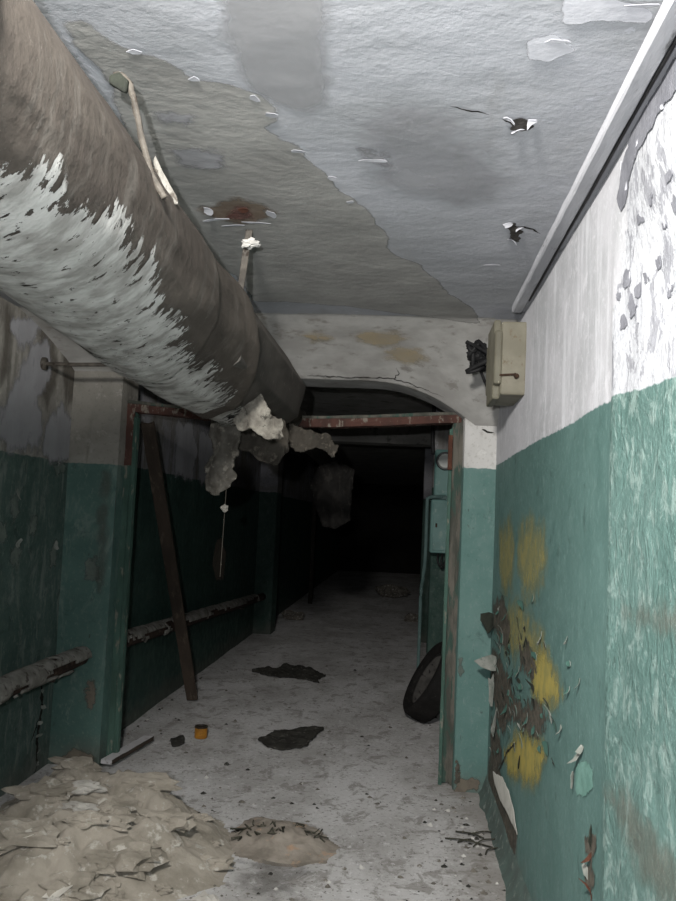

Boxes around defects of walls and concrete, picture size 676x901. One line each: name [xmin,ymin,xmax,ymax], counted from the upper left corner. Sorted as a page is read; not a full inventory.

peeling [562,0,660,24]
peeling [527,35,574,62]
spalling [503,117,538,134]
peeling [617,57,676,211]
peeling [65,21,479,323]
corrosion [201,198,276,227]
spalling [503,223,538,244]
peeling [616,269,649,330]
water stain [1,306,12,380]
water stain [40,329,75,403]
peeling [454,592,562,855]
peeling [567,745,593,796]